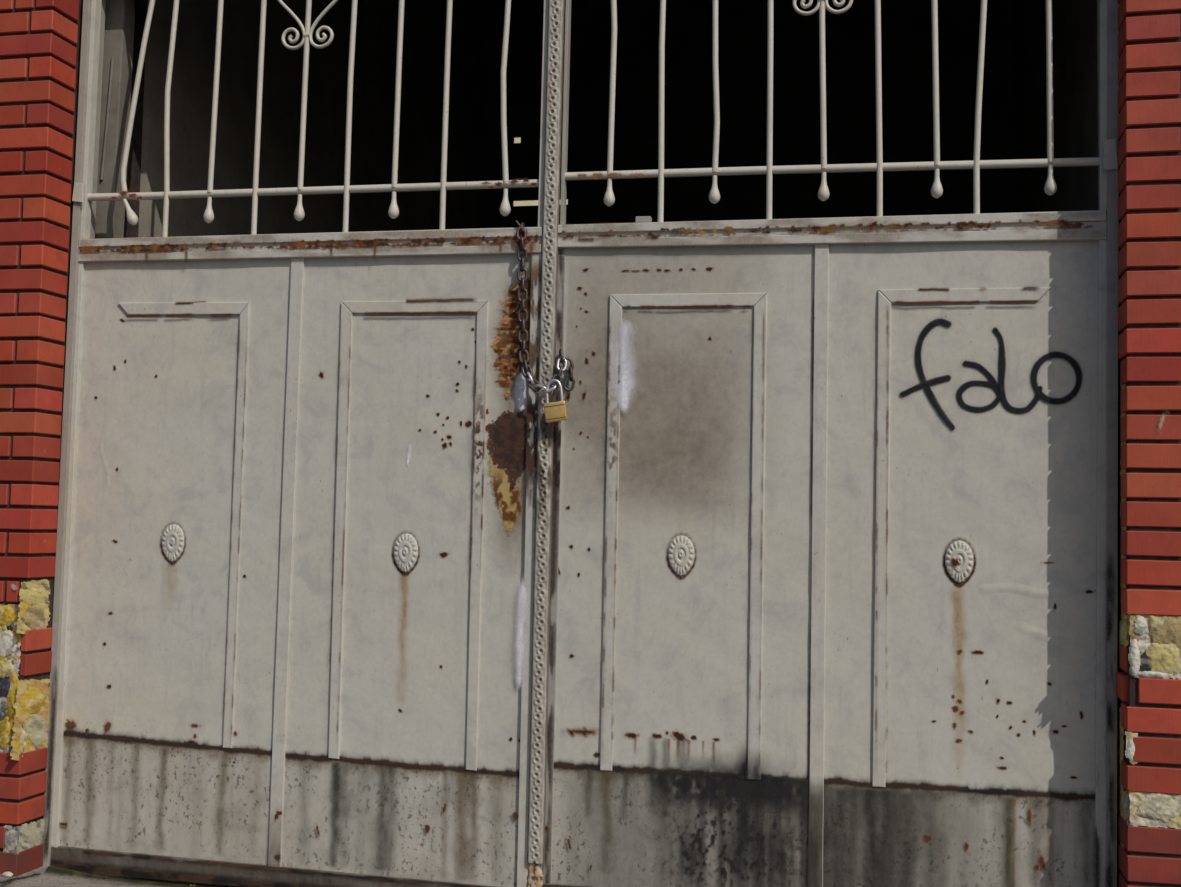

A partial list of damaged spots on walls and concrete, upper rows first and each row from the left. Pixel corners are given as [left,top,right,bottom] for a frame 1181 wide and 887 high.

corrosion [80,233,539,261]
corrosion [562,220,1001,243]
corrosion [1019,214,1093,229]
corrosion [418,267,541,529]
corrosion [553,421,575,487]
spalling [0,579,50,761]
corrosion [954,593,984,654]
damp [332,763,340,864]
damp [650,755,915,887]
spalling [1117,708,1181,861]